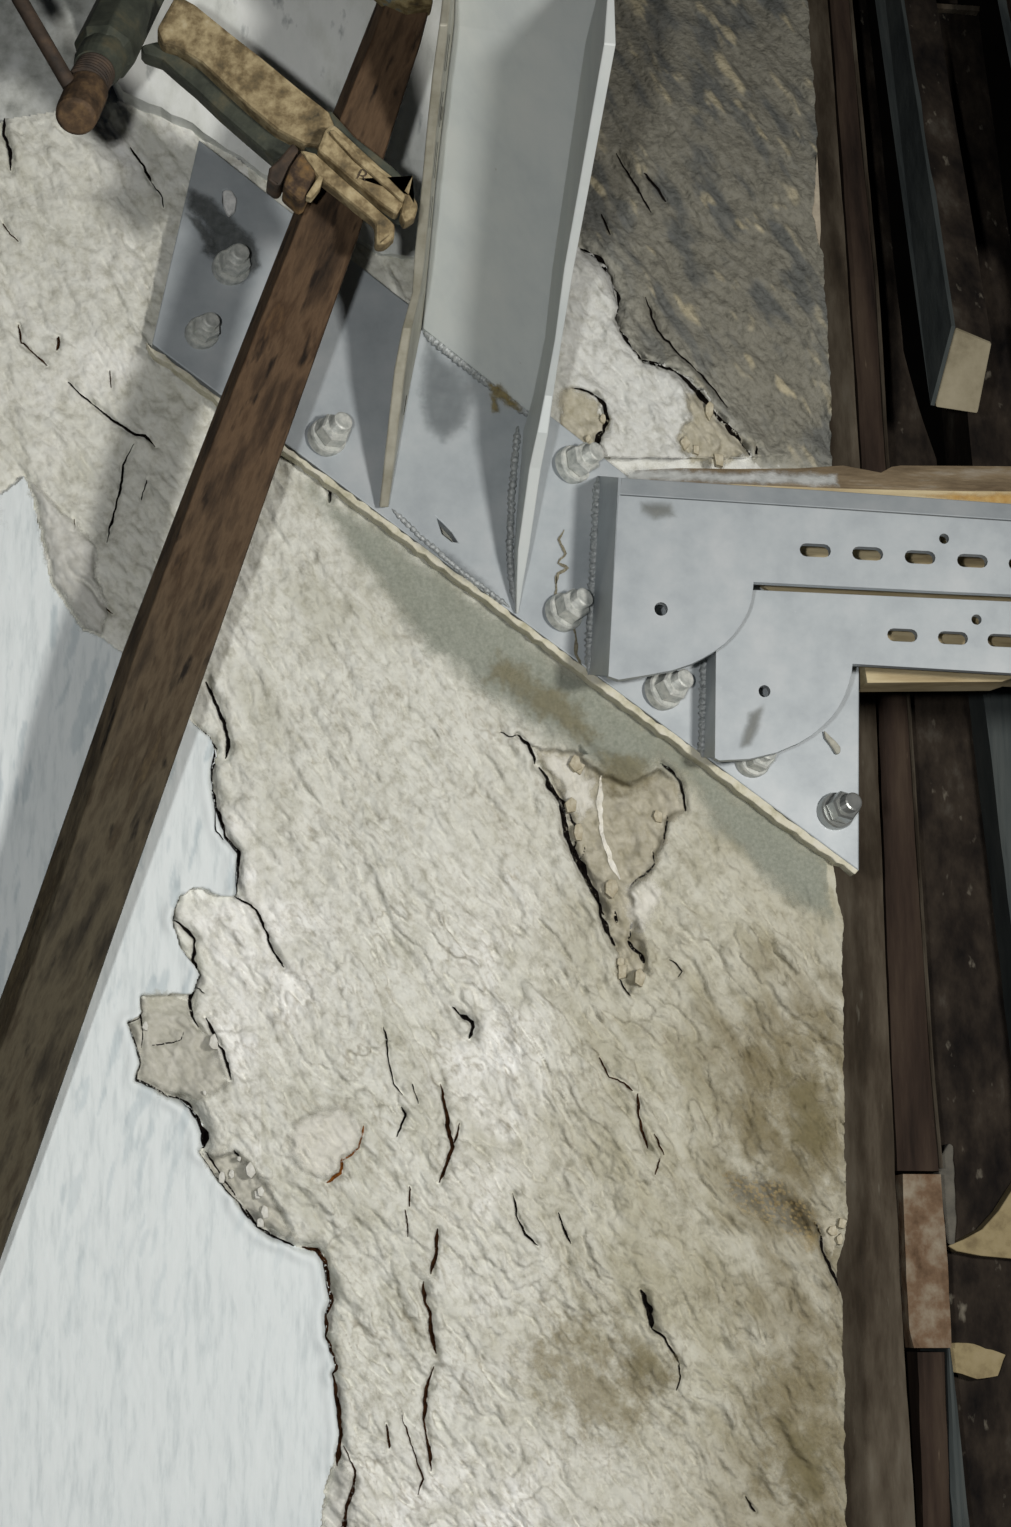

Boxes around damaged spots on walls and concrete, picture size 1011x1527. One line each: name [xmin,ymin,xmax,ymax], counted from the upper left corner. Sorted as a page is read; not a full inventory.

spalling [812,155,821,246]
crack [18,325,155,542]
spalling [559,387,610,444]
spalling [677,393,749,469]
damp [333,511,828,908]
spalling [537,750,684,990]
spalling [129,993,227,1099]
crack [452,1007,475,1039]
peeling [290,1109,362,1176]
crack [599,1057,664,1175]
crack [512,1193,571,1245]
crack [640,1289,681,1391]